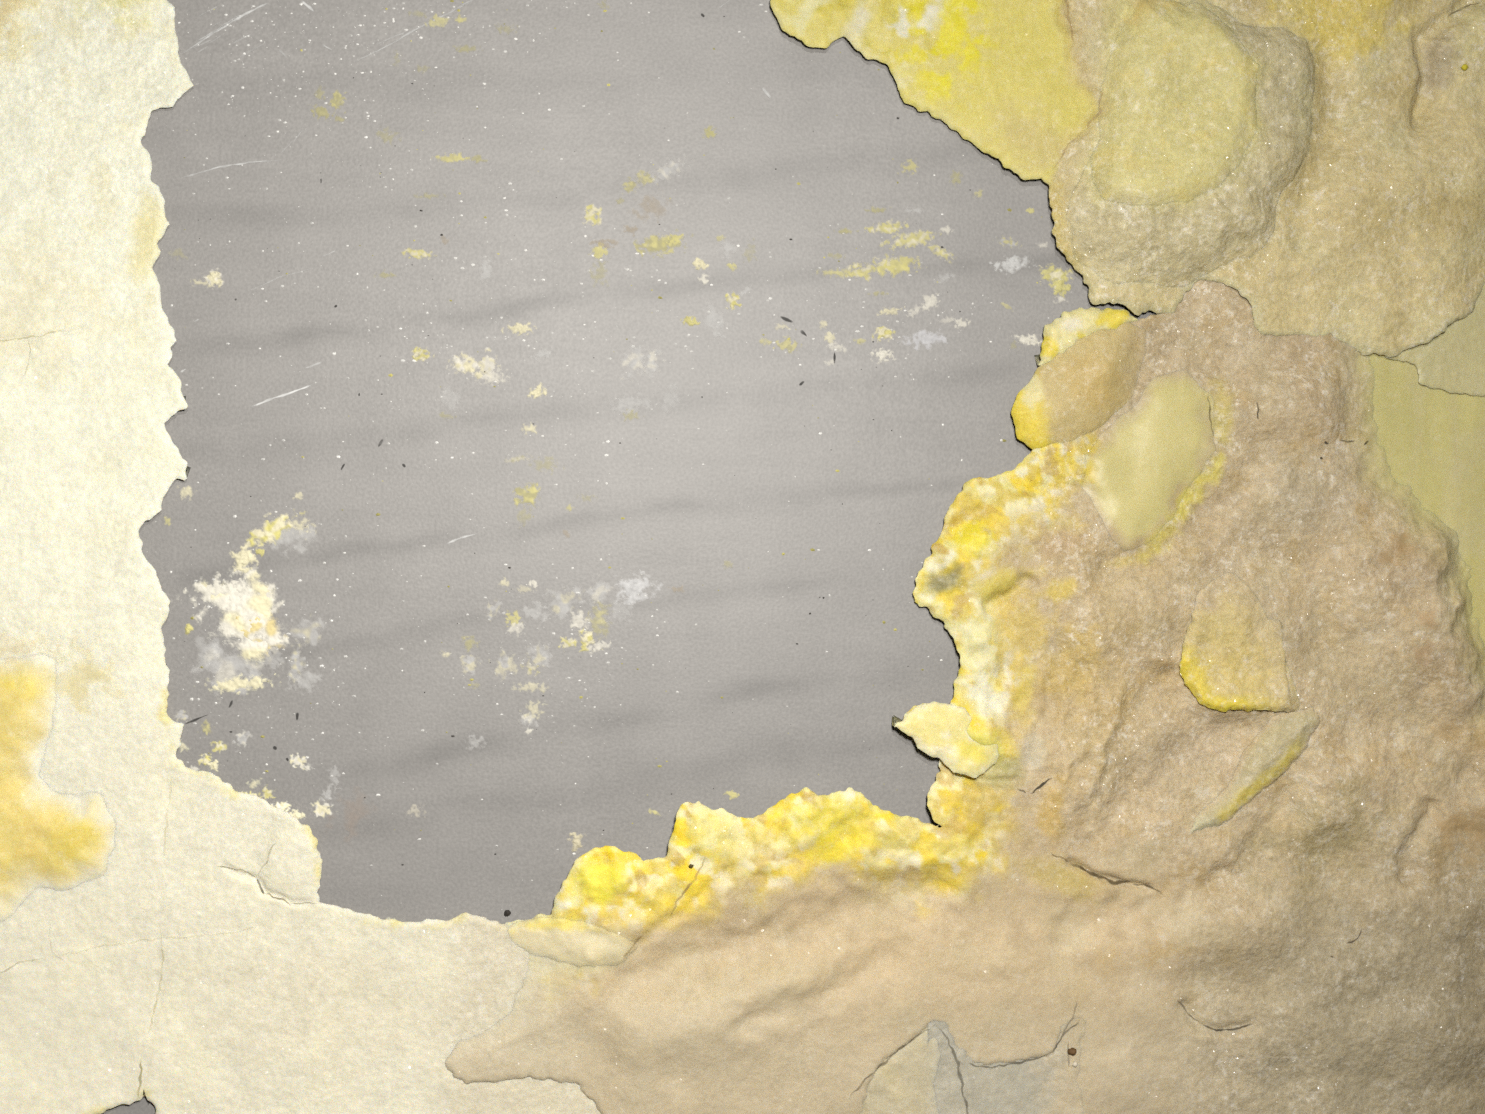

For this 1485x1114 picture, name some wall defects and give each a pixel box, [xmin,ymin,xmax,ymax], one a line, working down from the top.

peeling [848,208,949,281]
peeling [203,270,223,287]
peeling [990,250,1090,300]
peeling [871,308,970,363]
peeling [453,348,503,382]
peeling [183,513,292,695]
peeling [559,611,611,651]
peeling [198,734,246,771]
peeling [290,753,310,770]
peeling [892,701,999,778]
peeling [241,787,332,819]
crack [864,1025,1076,1107]